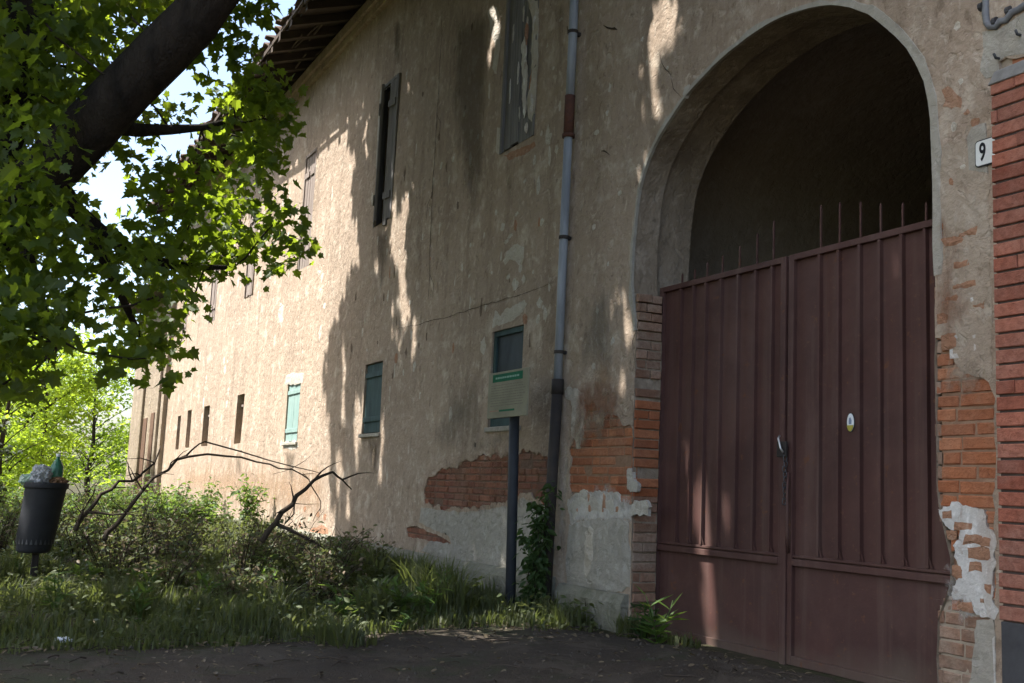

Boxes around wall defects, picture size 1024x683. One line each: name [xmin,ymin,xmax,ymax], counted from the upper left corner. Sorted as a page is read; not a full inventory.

crack [399,22,550,328]
flaking render [407,526,450,543]
flaking render [425,449,548,510]
flaking render [570,293,662,629]
flaking render [935,338,996,581]